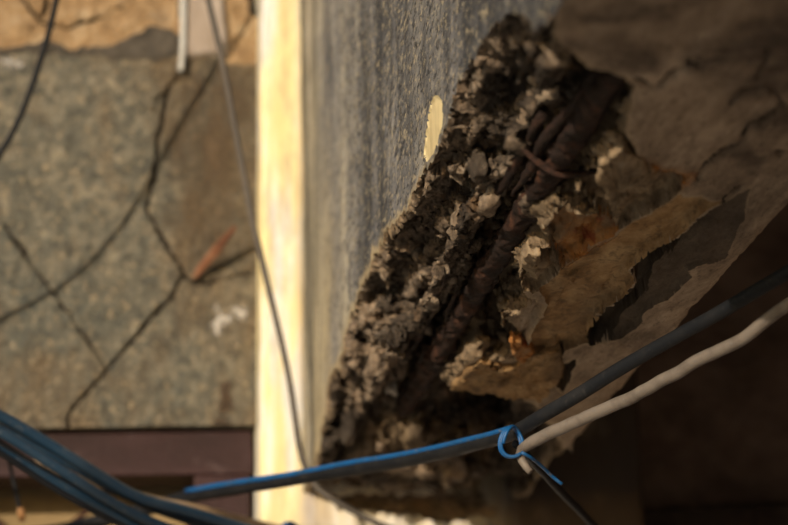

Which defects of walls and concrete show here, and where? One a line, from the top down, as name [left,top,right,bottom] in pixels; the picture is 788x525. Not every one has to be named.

crack [22,0,123,30]
crack [696,84,780,181]
crack [2,72,220,428]
spalling [313,9,750,467]
spalling [309,422,565,525]